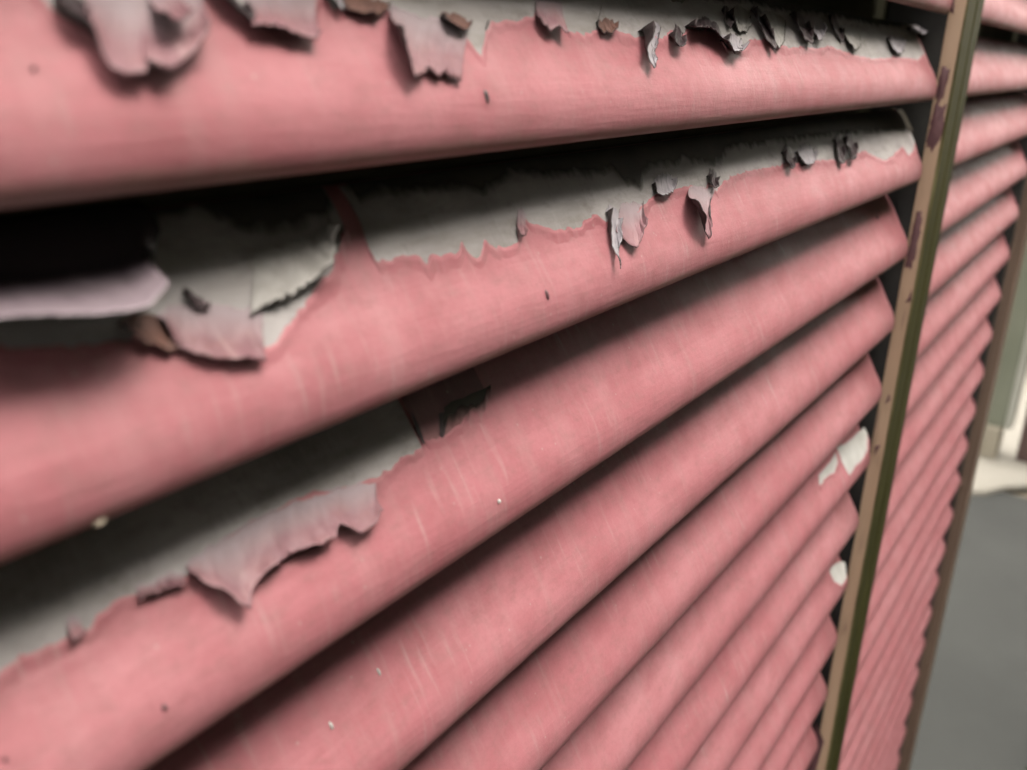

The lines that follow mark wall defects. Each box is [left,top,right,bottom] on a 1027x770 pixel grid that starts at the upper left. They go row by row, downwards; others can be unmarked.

peeling [32,0,211,76]
peeling [219,0,929,81]
peeling [0,109,917,371]
peeling [818,428,870,490]
peeling [0,367,491,699]
peeling [829,562,846,589]